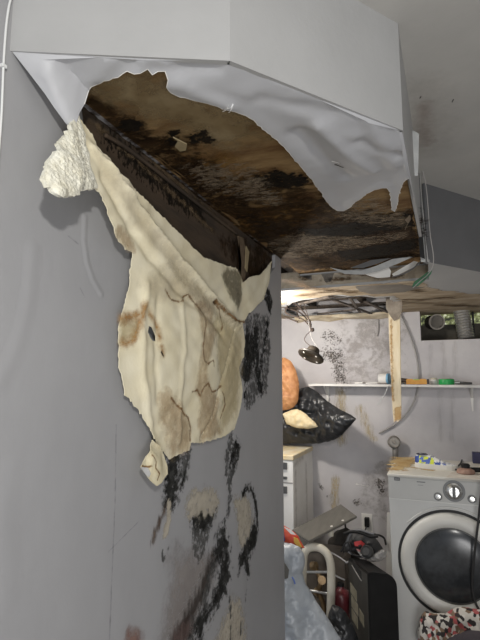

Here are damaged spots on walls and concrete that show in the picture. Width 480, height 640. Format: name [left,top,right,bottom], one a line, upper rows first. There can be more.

peeling [13,52,415,258]
leakage [86,70,428,308]
leakage [214,288,273,409]
leakage [320,329,348,384]
leakage [152,438,192,543]
leakage [165,434,259,640]